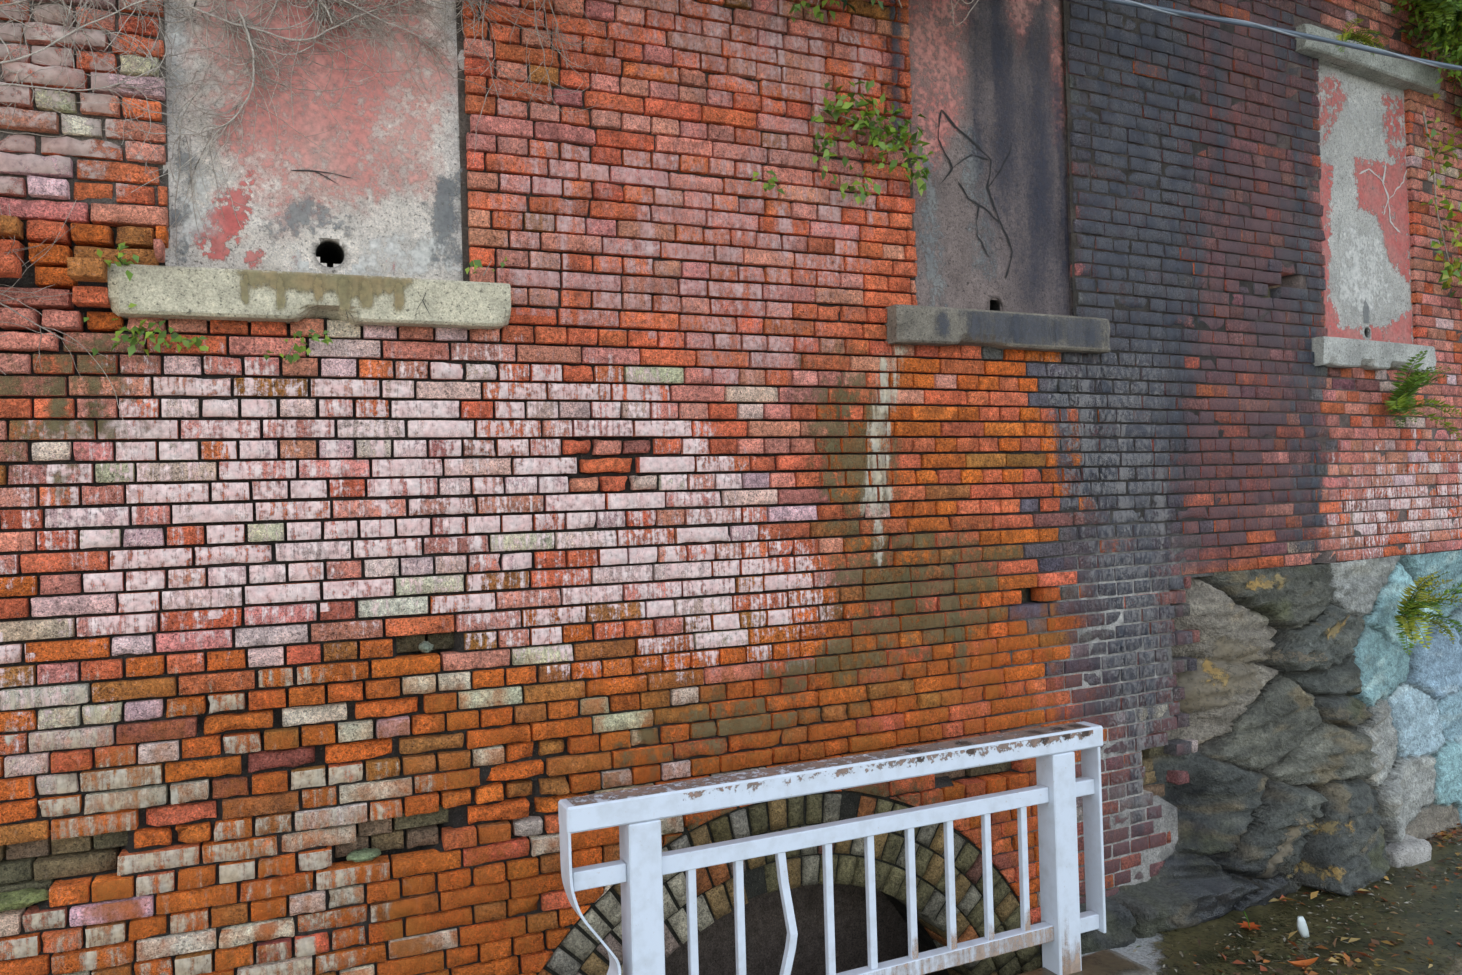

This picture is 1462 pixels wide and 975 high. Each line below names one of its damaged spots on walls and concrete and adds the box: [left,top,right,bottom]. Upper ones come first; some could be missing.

peeling [171,0,465,268]
leakage [225,235,461,311]
leakage [889,0,906,142]
peeling [1317,76,1413,344]
leakage [14,343,842,679]
spalling [562,439,657,492]
leakage [861,346,905,566]
leakage [936,0,1462,975]
spalling [0,800,217,912]